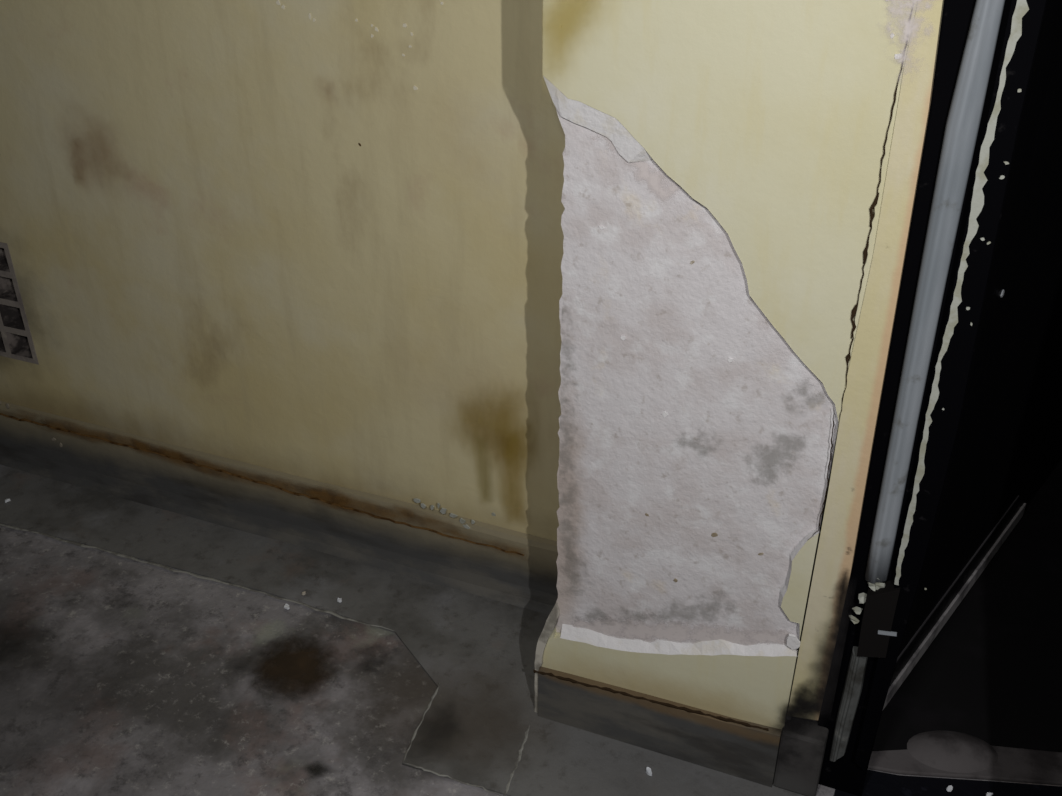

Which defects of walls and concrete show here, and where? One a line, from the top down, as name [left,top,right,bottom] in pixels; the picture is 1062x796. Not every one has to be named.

spalling [543,76,839,657]
crack [808,8,913,540]
damp [779,576,850,731]